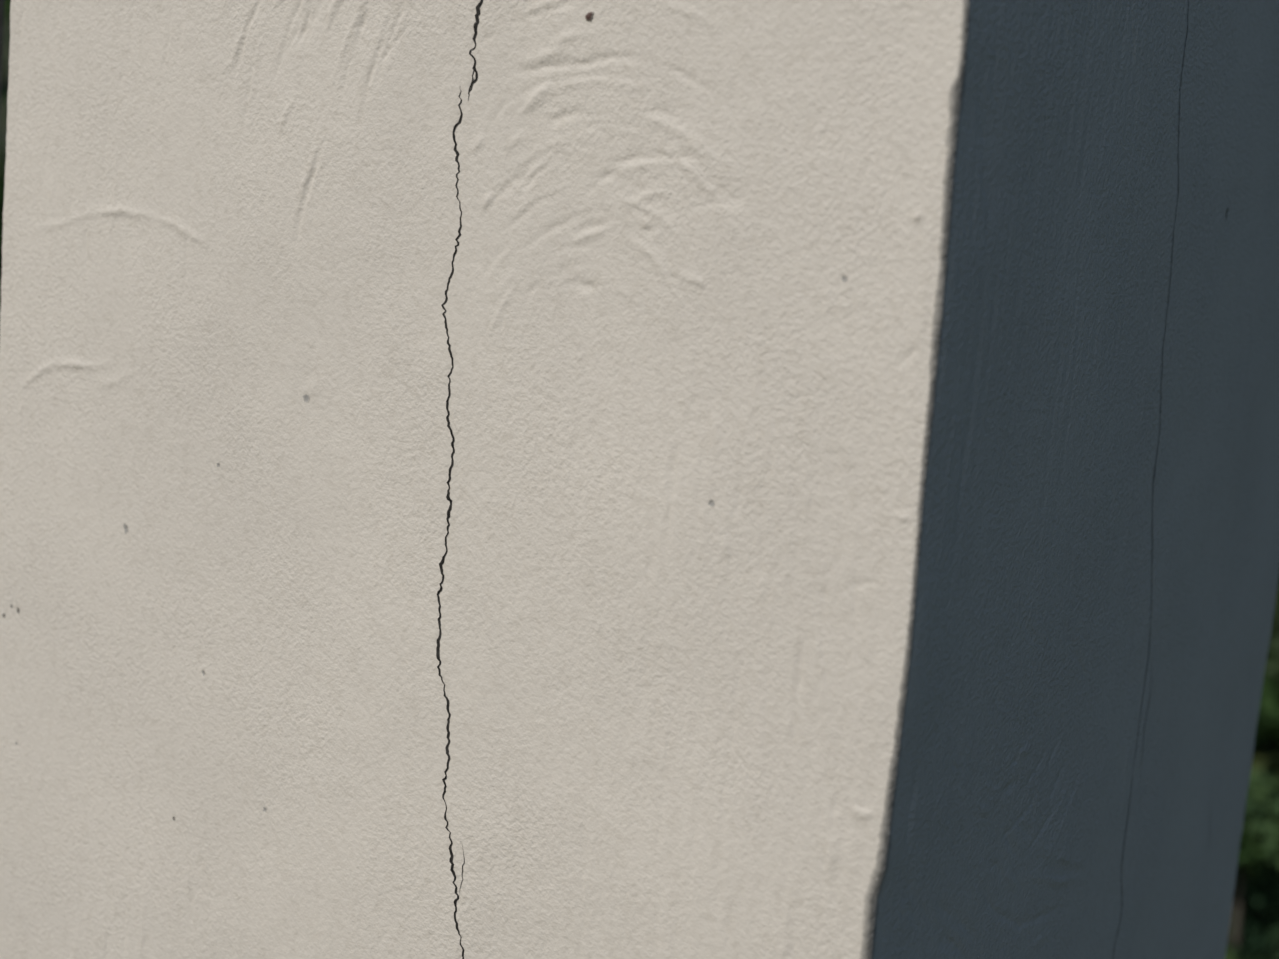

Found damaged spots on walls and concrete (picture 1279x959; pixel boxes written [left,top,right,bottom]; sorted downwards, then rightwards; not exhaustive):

crack [436,0,483,959]